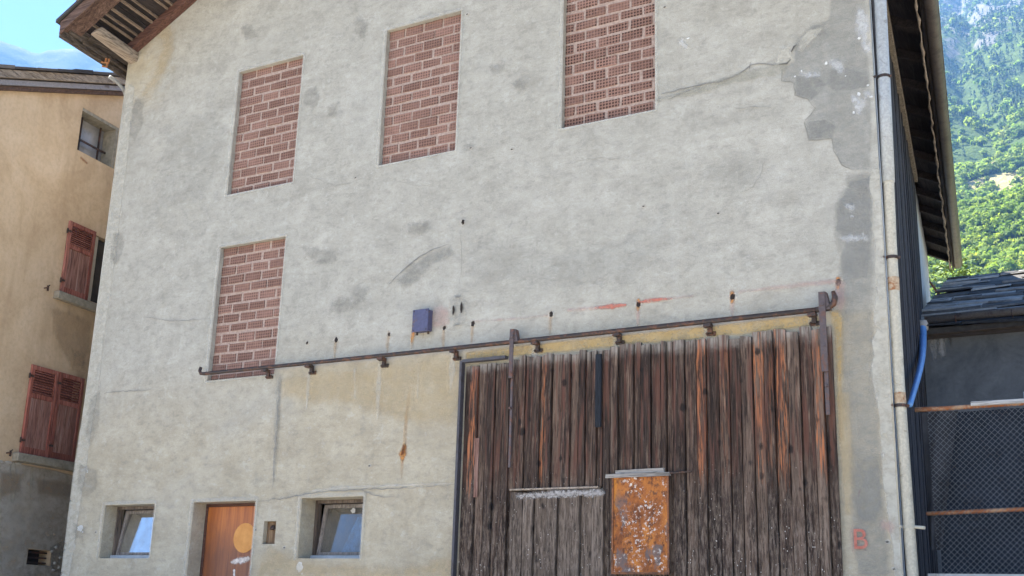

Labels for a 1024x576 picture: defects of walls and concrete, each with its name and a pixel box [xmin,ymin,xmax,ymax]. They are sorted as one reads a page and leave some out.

crack [662,44,797,109]
rust [467,316,811,359]